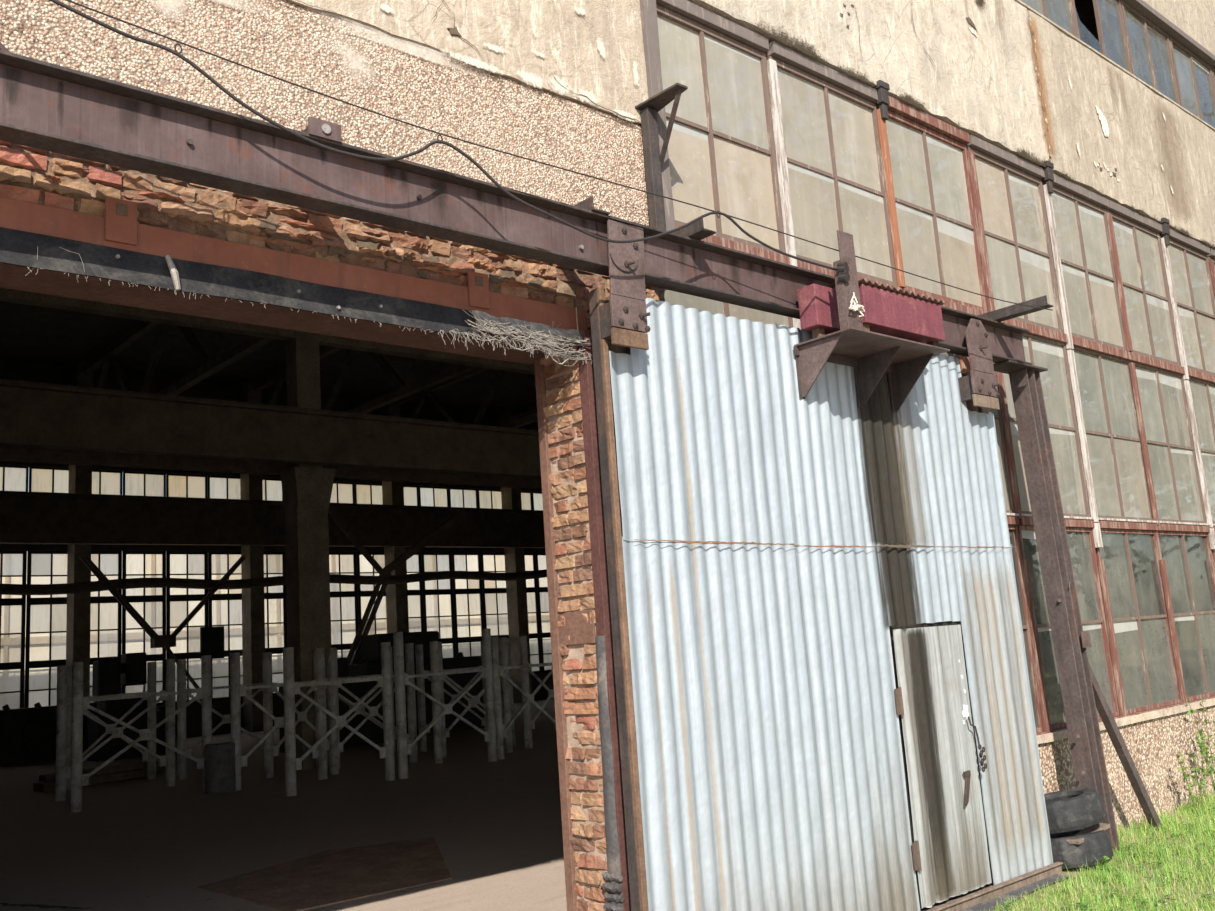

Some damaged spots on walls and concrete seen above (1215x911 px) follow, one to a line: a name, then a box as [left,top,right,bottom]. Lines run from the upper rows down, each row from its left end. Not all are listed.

spalling [443,43,642,123]
leakage [853,370,954,900]